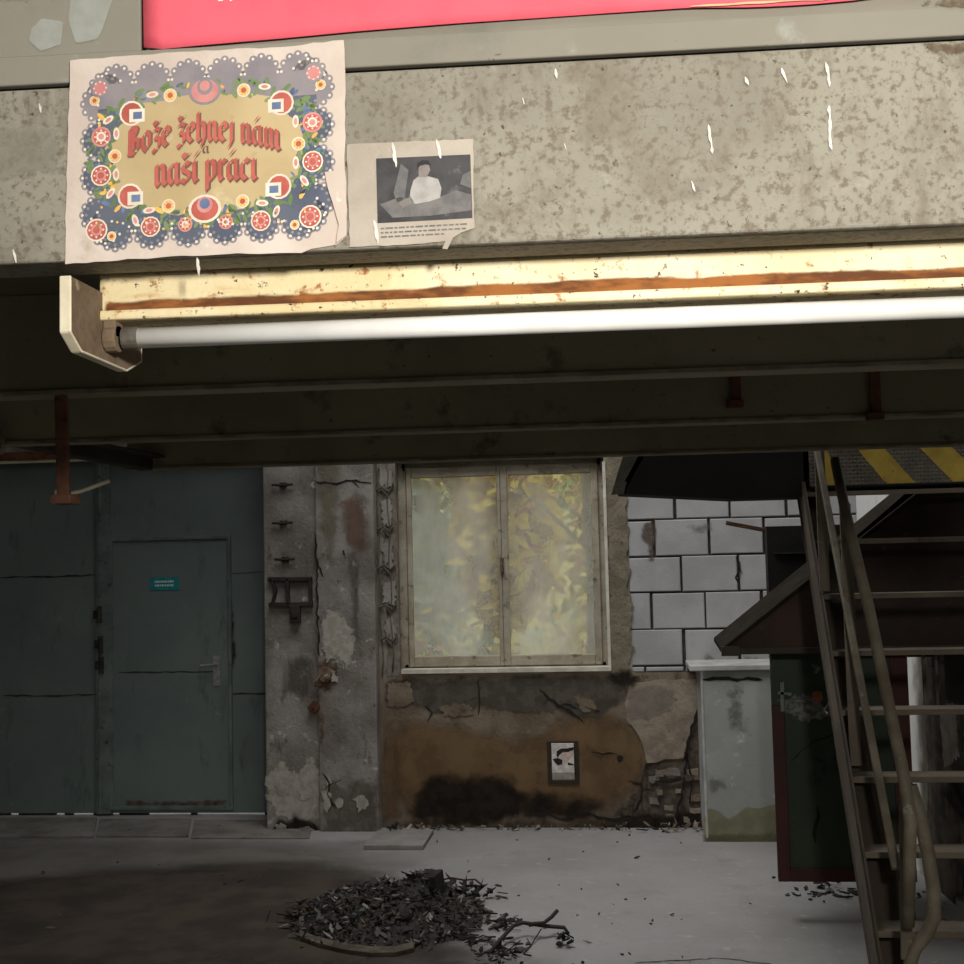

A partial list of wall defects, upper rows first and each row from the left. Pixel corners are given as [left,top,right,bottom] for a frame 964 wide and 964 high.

peeling [29,0,112,51]
crack [314,479,371,487]
leakage [320,465,366,550]
crack [314,532,324,656]
peeling [321,606,356,671]
flaking render [377,464,703,828]
crack [539,689,584,723]
peeling [265,758,378,832]
crack [322,773,341,807]
leakage [383,716,647,828]